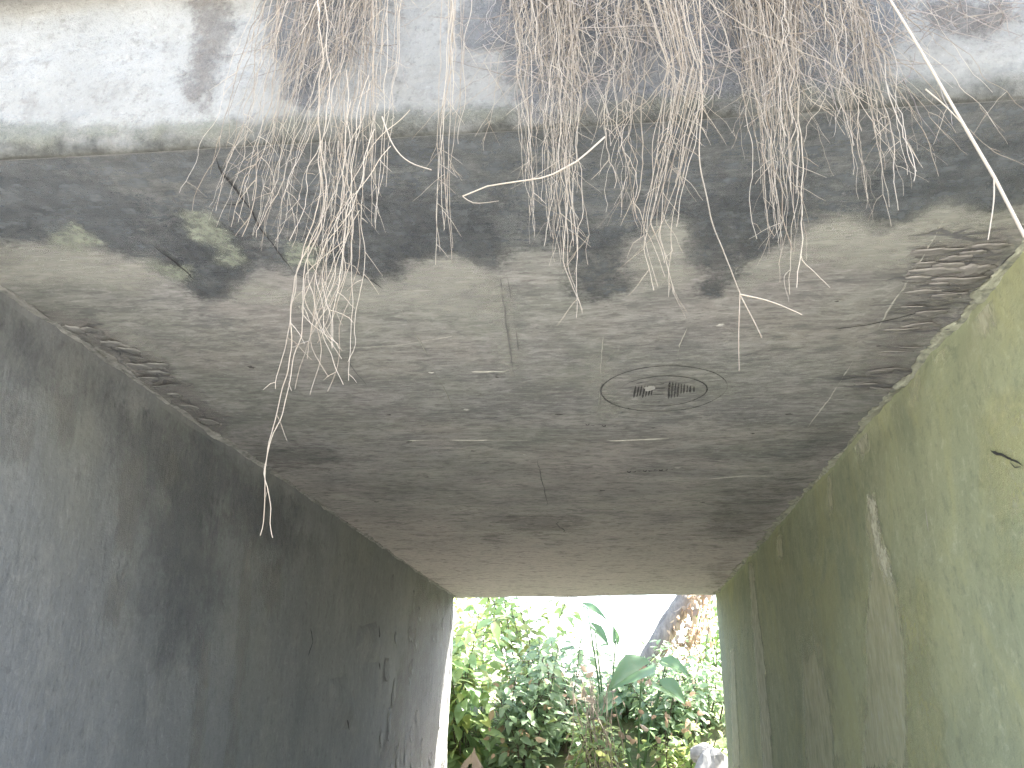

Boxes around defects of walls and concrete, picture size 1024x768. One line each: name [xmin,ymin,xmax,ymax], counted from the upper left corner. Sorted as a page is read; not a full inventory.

crack [212,148,308,279]
damp [0,103,1024,324]
peeling [48,312,229,429]
peeling [836,228,1014,390]